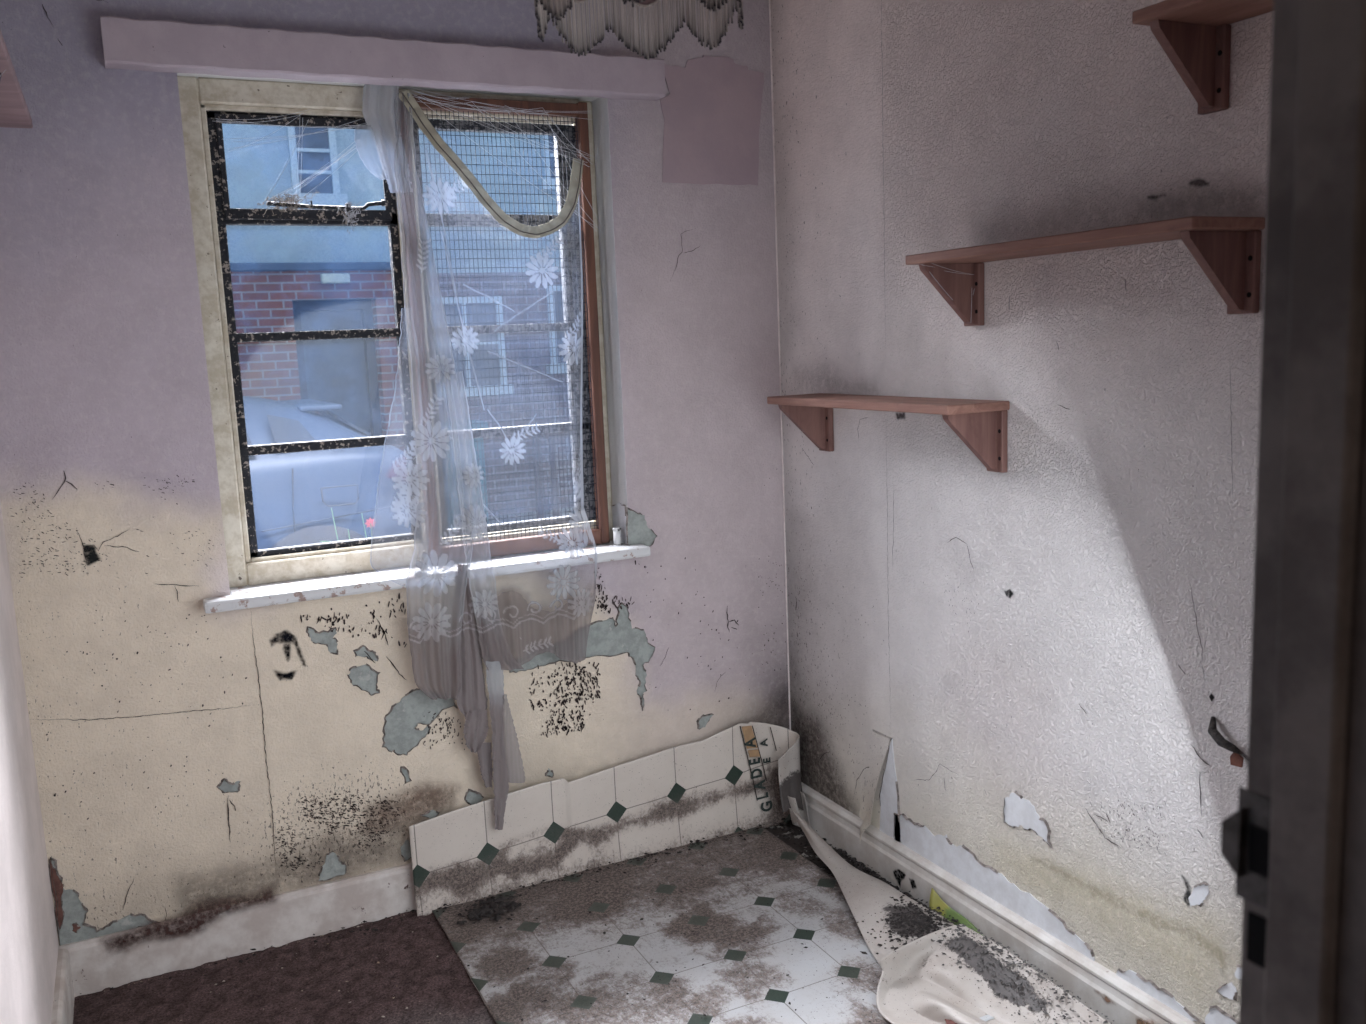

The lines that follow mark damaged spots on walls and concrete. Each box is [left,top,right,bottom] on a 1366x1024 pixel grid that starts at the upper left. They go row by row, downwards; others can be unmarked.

peeling [612,503,657,547]
peeling [306,626,381,696]
peeling [382,688,457,784]
damp [529,661,601,738]
peeling [509,602,655,711]
peeling [216,778,241,793]
damp [274,791,446,876]
peeling [879,738,1095,961]
peeling [48,857,158,945]
damp [107,888,274,949]
peeling [1188,882,1209,907]
peeling [1116,964,1241,1024]